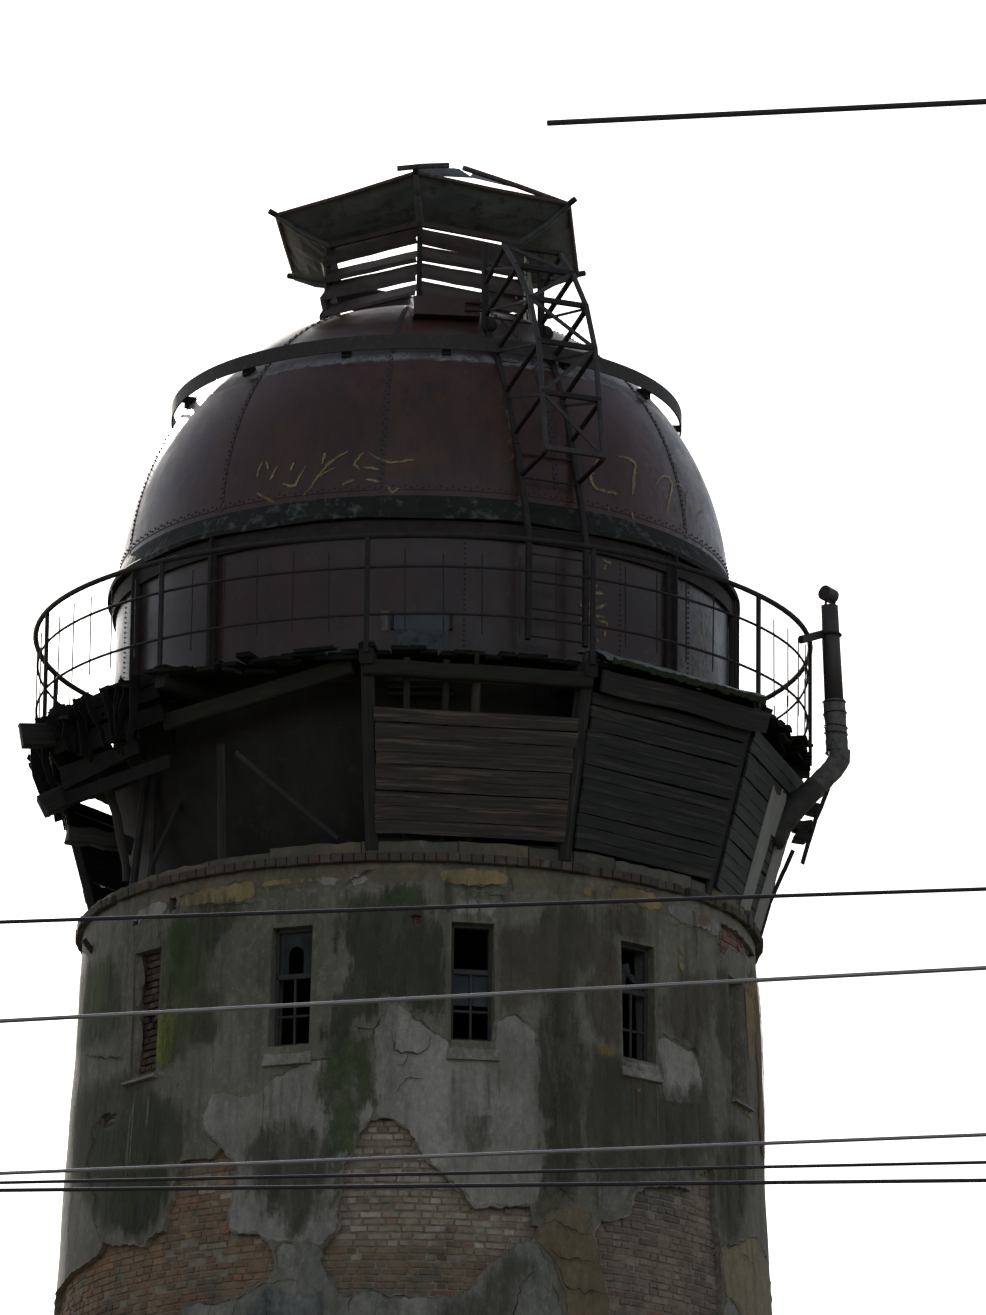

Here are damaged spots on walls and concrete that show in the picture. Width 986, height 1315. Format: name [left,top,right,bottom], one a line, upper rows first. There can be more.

spalling [53,1002,562,1315]
peeling [719,1234,773,1315]